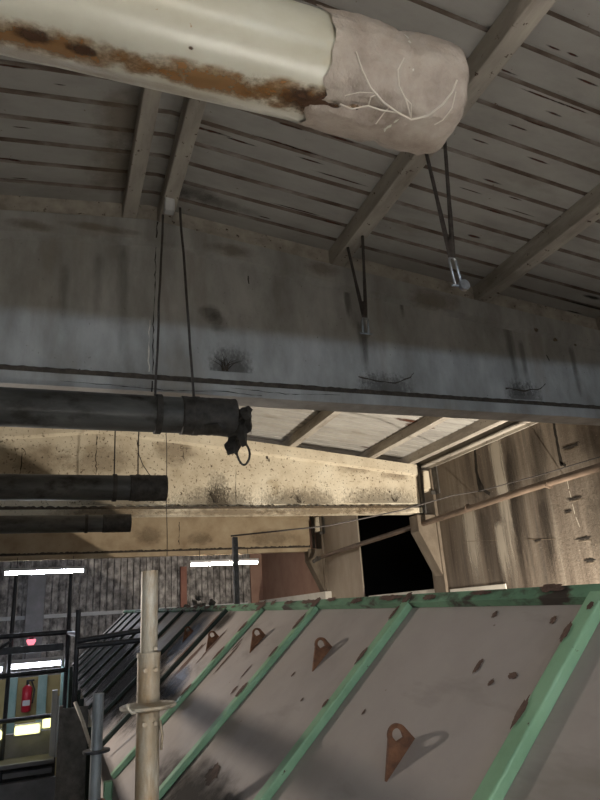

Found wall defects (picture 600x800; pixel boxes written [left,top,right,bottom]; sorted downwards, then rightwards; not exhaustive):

rust [0,22,341,110]
rust [540,584,565,592]